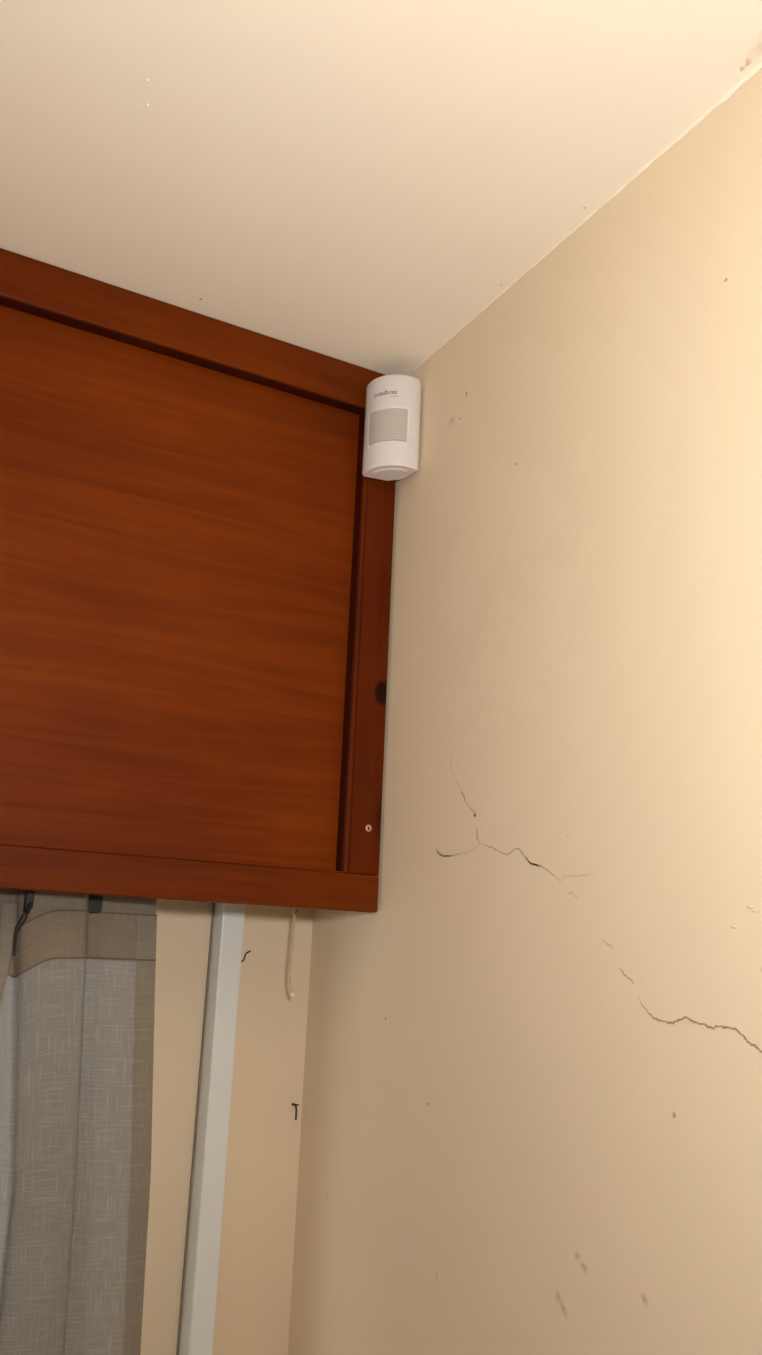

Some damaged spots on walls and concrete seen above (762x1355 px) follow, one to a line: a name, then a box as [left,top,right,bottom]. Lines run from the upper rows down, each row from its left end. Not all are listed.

crack [436,749,592,900]
crack [602,940,762,1053]